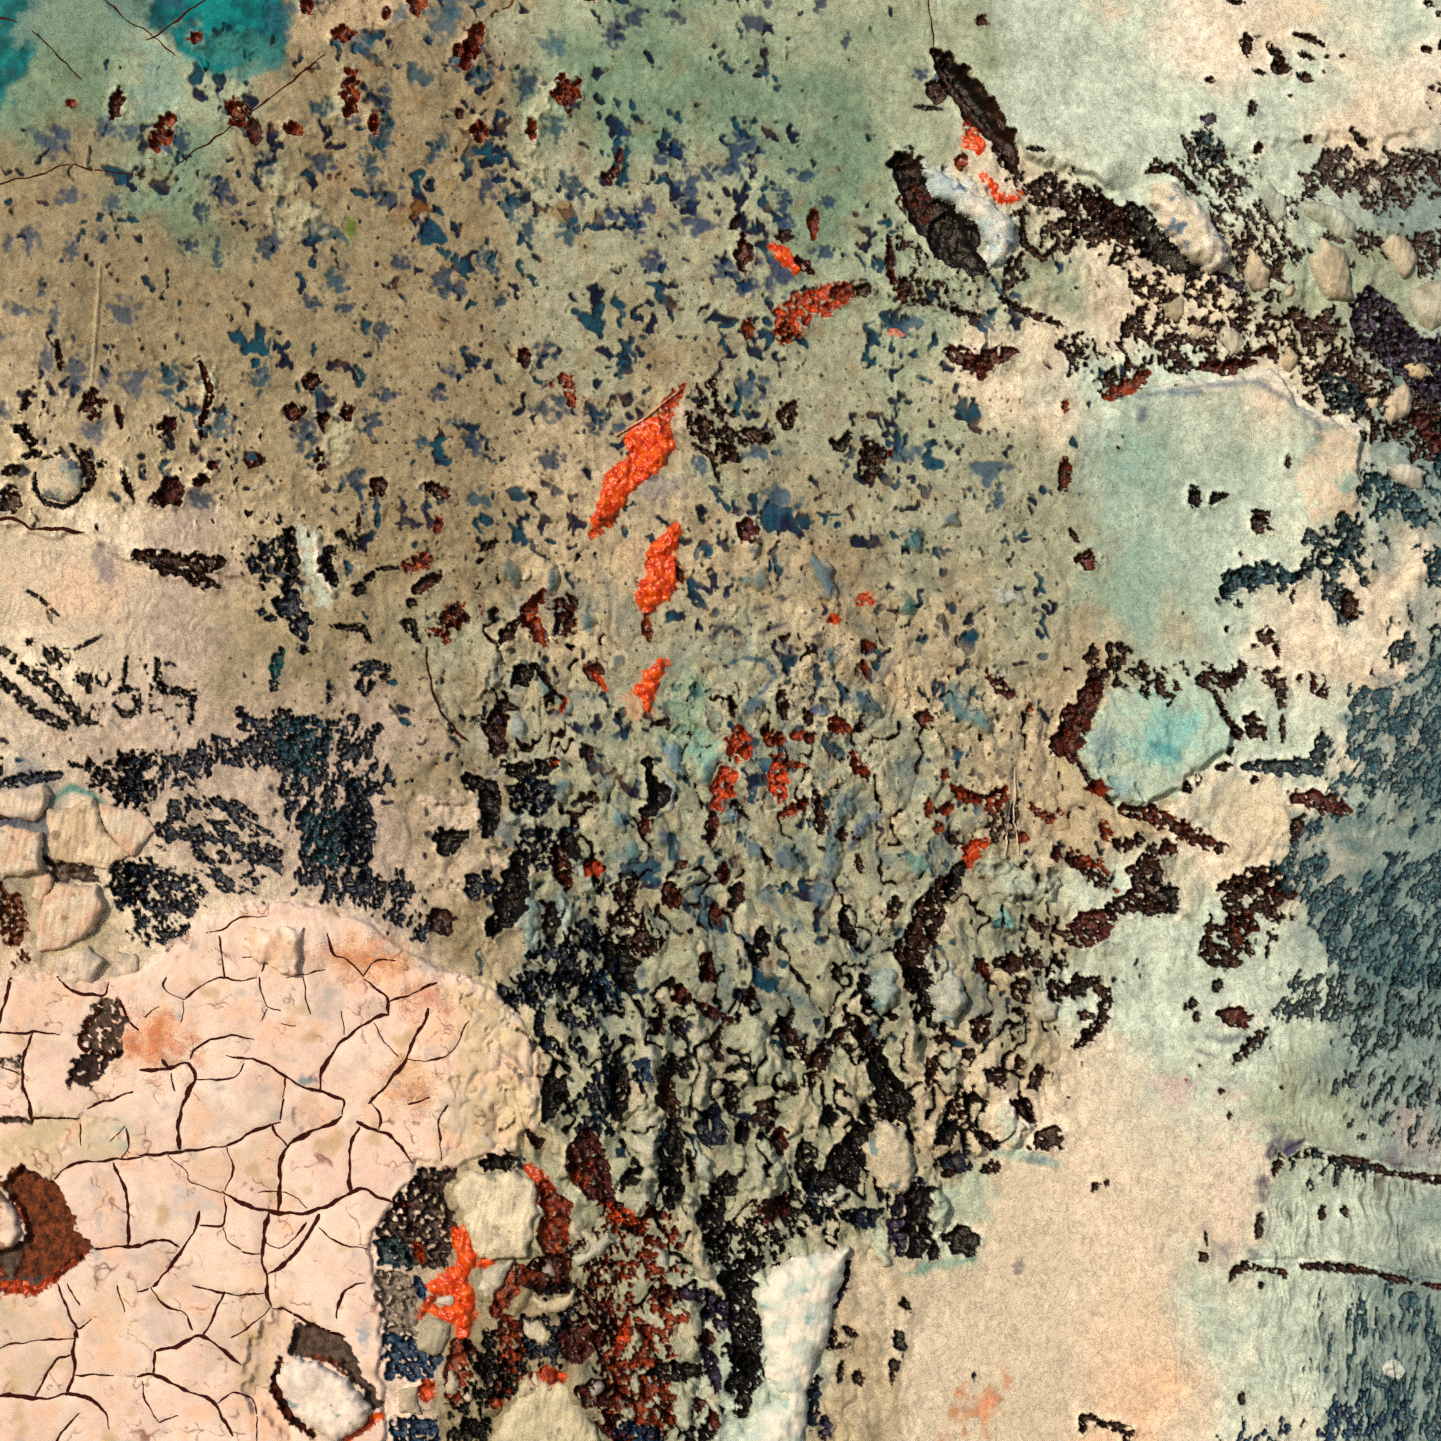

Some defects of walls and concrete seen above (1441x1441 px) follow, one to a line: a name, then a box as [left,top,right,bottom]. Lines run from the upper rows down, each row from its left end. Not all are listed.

corrosion [768,243,856,344]
spalling [883,48,1441,626]
corrosion [588,383,685,540]
peeling [686,380,798,481]
corrosion [635,524,685,641]
corrosion [633,659,670,712]
peeling [1198,606,1441,1148]
peeling [270,642,1288,1441]
spalling [0,1168,93,1292]
crack [0,916,469,1441]
corrosion [418,1163,690,1441]
peeling [1237,1282,1441,1441]